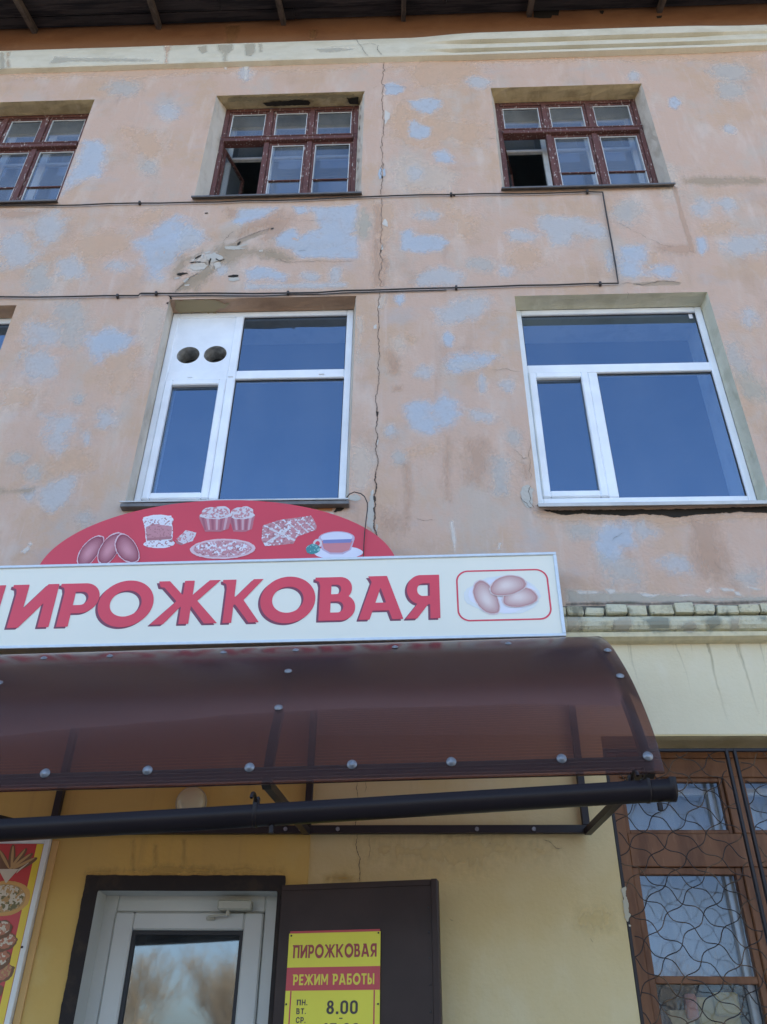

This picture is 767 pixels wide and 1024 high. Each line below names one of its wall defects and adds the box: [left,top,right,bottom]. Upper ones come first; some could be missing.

peeling [137,217,199,274]
peeling [175,205,357,289]
peeling [510,215,604,243]
crack [353,38,387,536]
peeling [408,397,456,433]
flaking render [545,506,767,562]